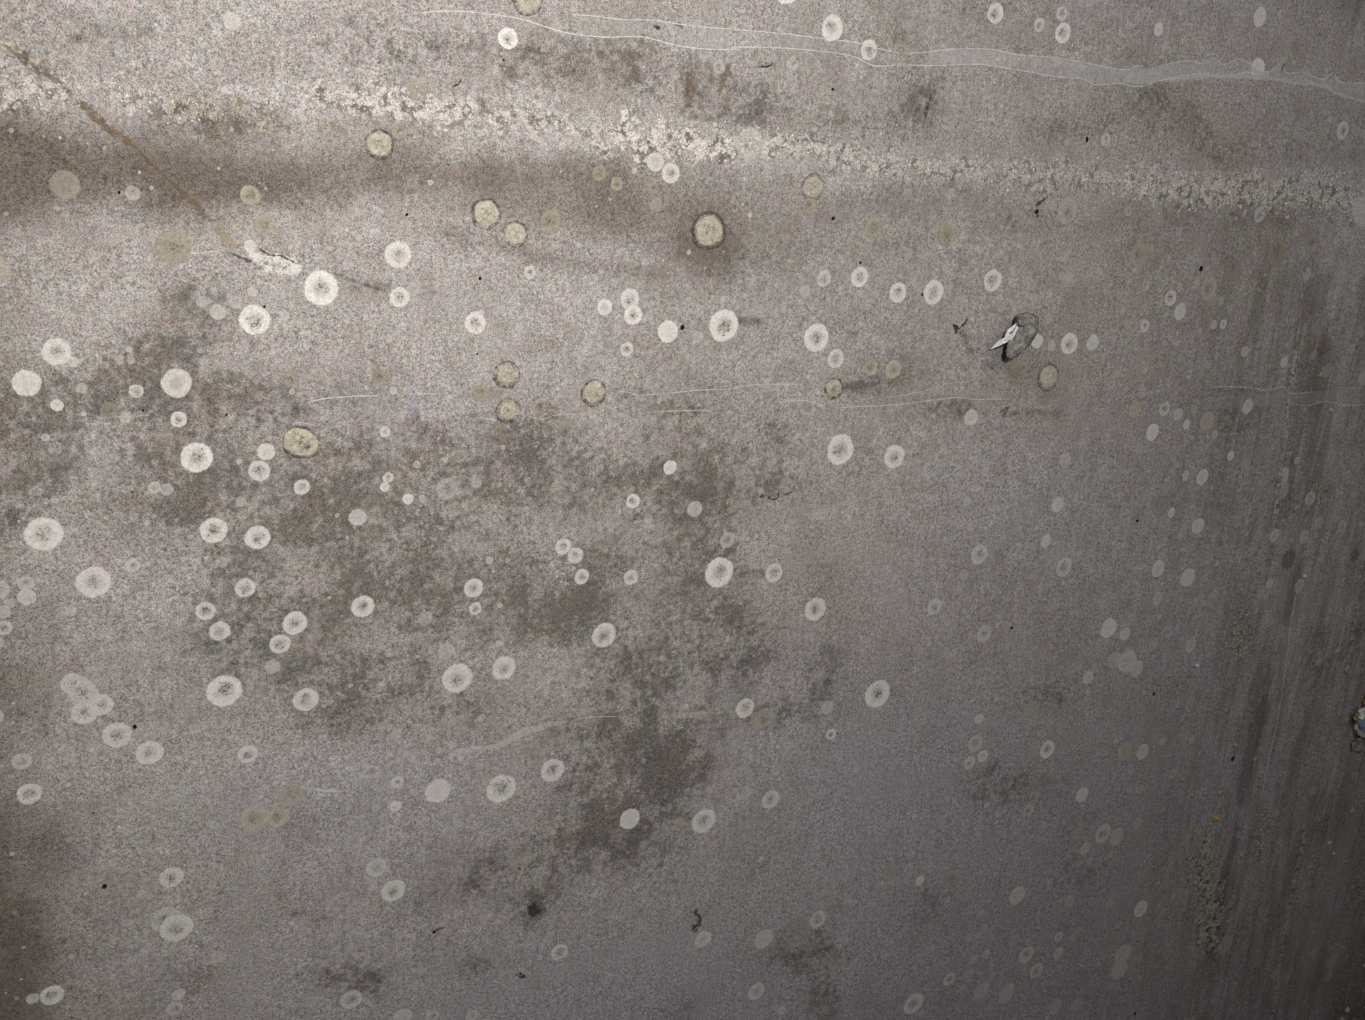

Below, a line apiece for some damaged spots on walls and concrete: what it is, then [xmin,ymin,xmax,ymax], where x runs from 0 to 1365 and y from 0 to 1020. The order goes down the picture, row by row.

leakage [304,270,338,305]
leakage [210,304,271,335]
leakage [709,309,738,342]
leakage [11,338,79,396]
leakage [161,369,192,427]
leakage [181,442,213,473]
leakage [24,517,64,551]
leakage [244,526,271,549]
leakage [705,532,734,588]
leakage [269,611,307,653]
leakage [205,675,242,707]
peeling [1354,707,1365,738]